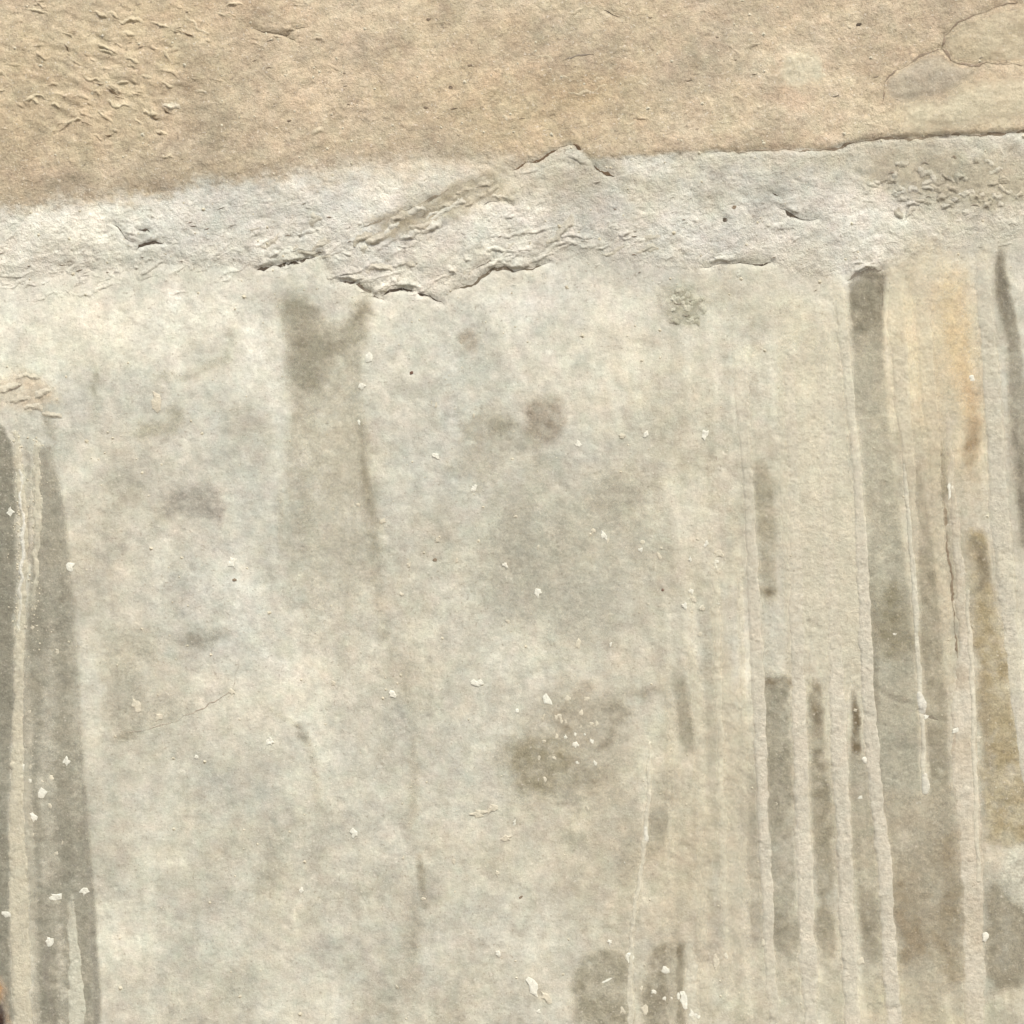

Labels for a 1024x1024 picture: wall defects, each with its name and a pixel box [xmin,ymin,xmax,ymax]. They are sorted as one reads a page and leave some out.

flaking render [16,3,218,142]
peeling [0,169,691,303]
spalling [858,153,1024,229]
crack [883,2,1024,100]
damp [995,249,1024,546]
damp [0,425,101,1024]
damp [747,673,800,995]
damp [807,681,835,967]
damp [849,271,964,1024]
damp [969,529,1024,988]
damp [571,949,629,1024]
damp [640,944,687,1024]